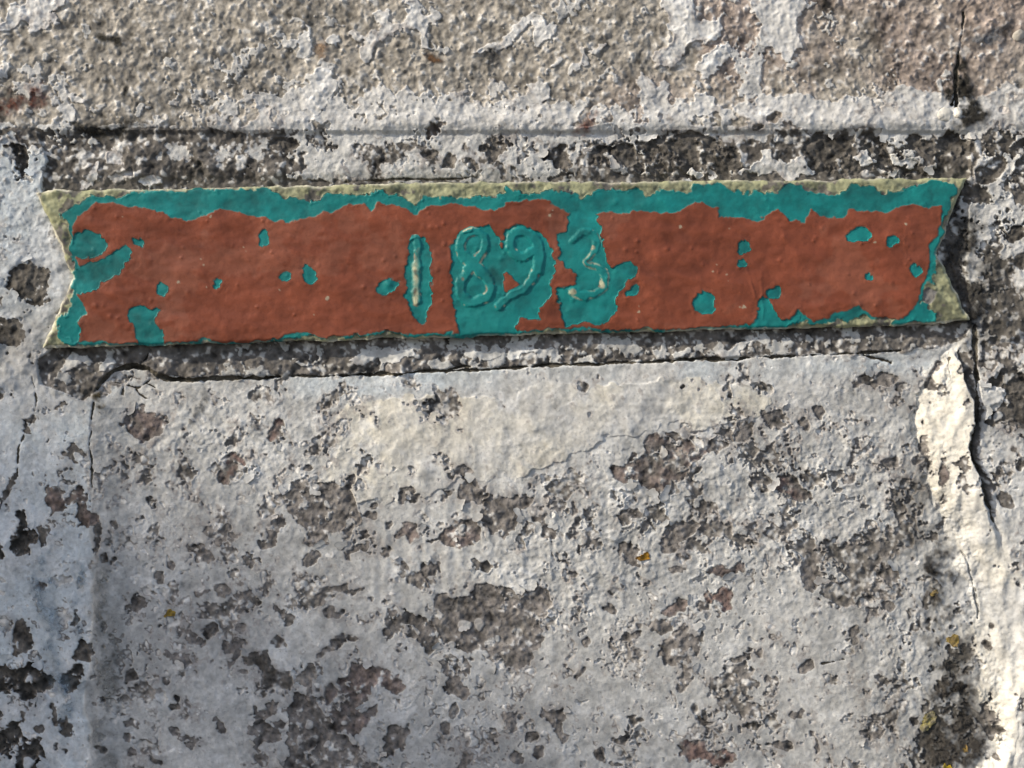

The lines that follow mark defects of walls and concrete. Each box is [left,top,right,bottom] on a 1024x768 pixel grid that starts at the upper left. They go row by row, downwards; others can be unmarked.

peeling [636,0,732,97]
crack [950,12,965,108]
peeling [42,148,162,295]
peeling [450,107,976,361]
peeling [0,481,118,565]
crack [89,350,901,488]
peeling [610,401,825,554]
crack [948,326,994,523]
spalling [0,618,95,768]
peeling [152,584,410,768]
peeling [242,464,566,735]
peeling [606,561,745,673]